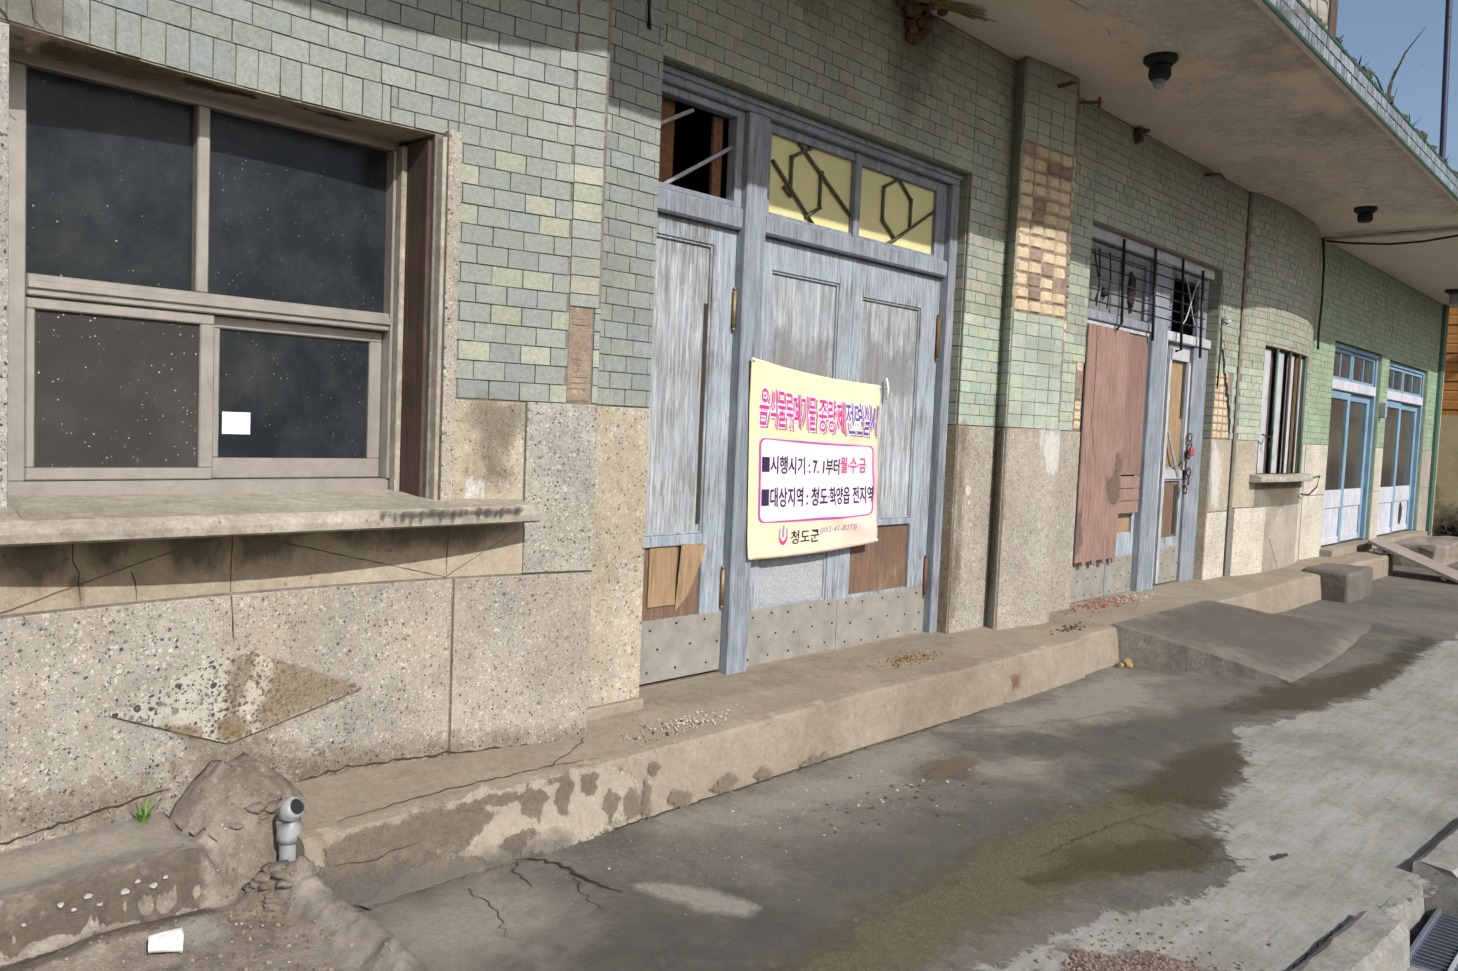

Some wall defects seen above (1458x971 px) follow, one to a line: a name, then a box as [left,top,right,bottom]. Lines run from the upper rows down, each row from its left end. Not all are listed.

crack [0,0,48,35]
crack [72,544,81,601]